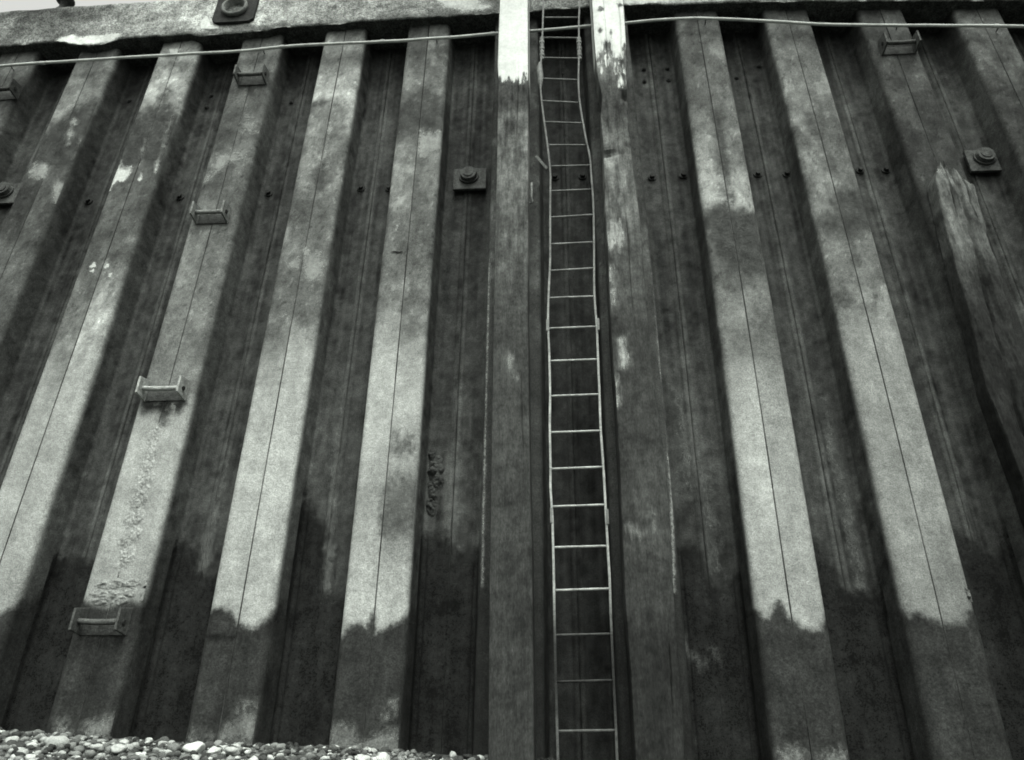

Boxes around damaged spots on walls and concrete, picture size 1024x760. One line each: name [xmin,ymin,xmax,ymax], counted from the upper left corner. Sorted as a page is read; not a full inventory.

water stain [0,598,40,726]
water stain [45,600,161,739]
water stain [185,608,287,745]
water stain [329,612,416,752]
water stain [746,600,850,760]
water stain [886,609,1012,760]